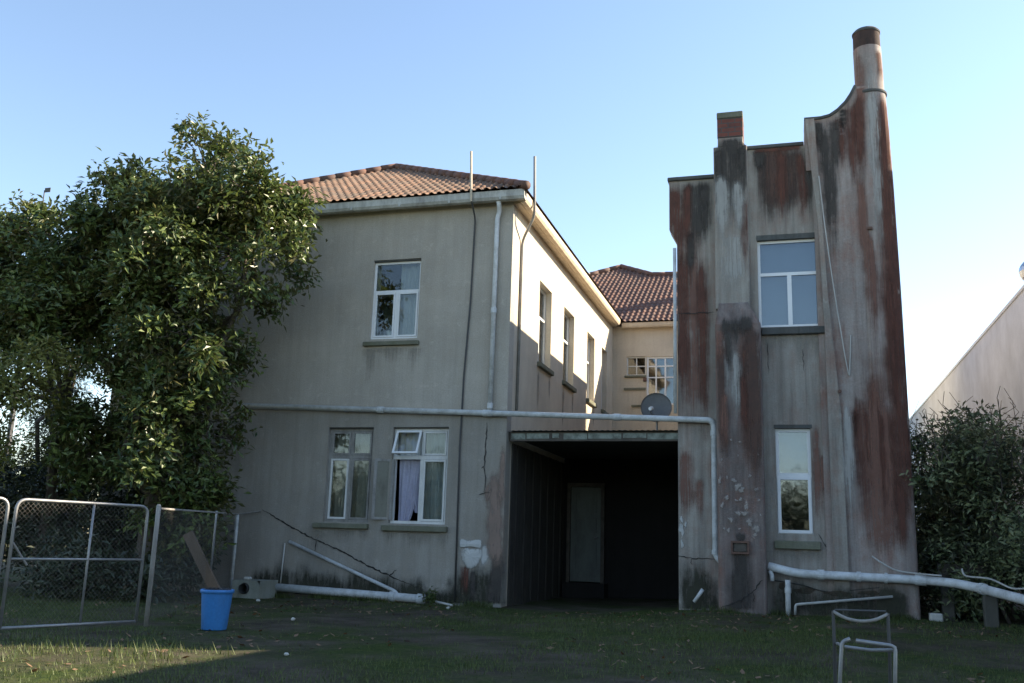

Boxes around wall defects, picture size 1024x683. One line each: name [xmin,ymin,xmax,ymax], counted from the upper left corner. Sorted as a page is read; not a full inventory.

water stain [681,109,848,279]
rust [755,146,807,210]
rust [669,185,728,453]
rust [835,57,912,541]
rust [739,331,762,475]
crack [479,429,489,495]
spalling [718,474,762,536]
water stain [254,554,504,604]
peeling [460,539,489,569]